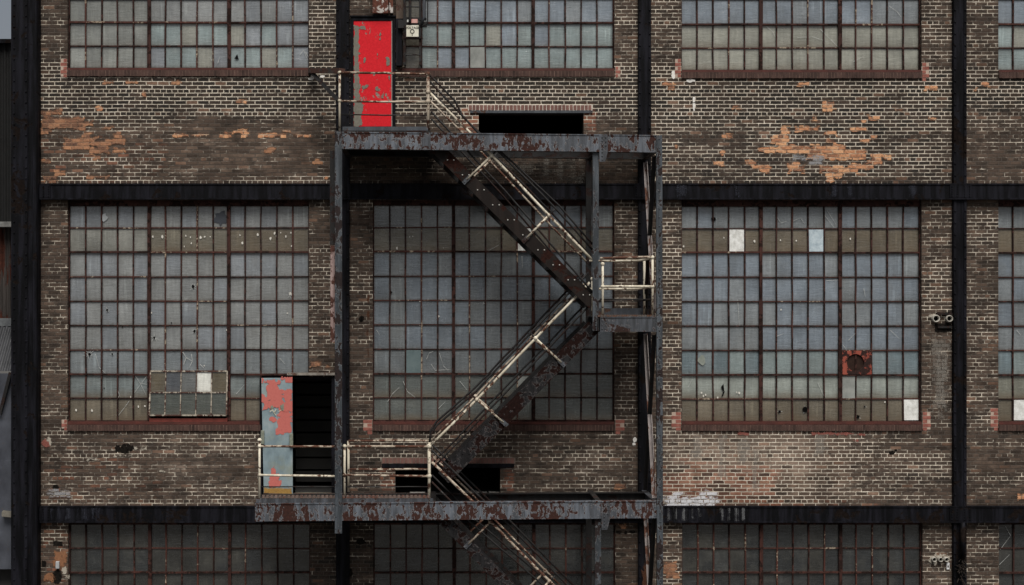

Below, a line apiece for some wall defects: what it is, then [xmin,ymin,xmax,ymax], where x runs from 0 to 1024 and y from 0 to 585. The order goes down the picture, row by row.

peeling [353,25,390,127]
spalling [41,105,126,160]
spalling [173,129,311,153]
spalling [714,133,733,166]
spalling [745,101,891,183]
spalling [41,159,66,183]
peeling [262,376,292,435]
peeling [269,468,282,488]
leakage [663,492,745,520]